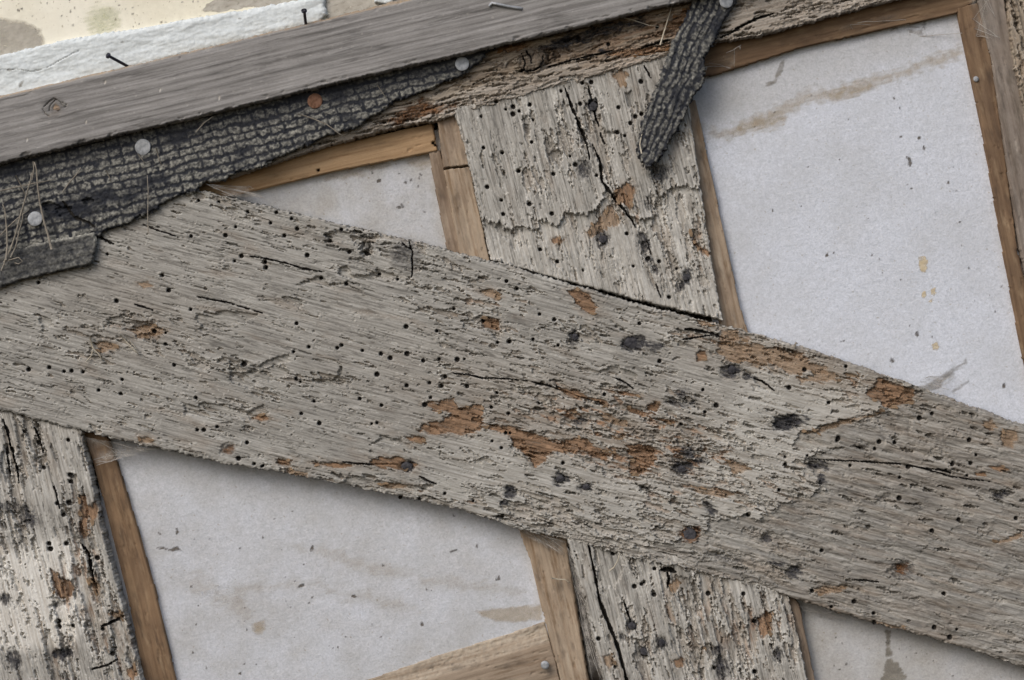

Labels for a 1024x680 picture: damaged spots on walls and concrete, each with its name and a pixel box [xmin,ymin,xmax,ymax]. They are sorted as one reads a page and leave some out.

crack [638,39,670,79]
crack [521,50,652,255]
peeling [406,388,676,477]
peeling [802,378,915,435]
crack [587,545,631,680]